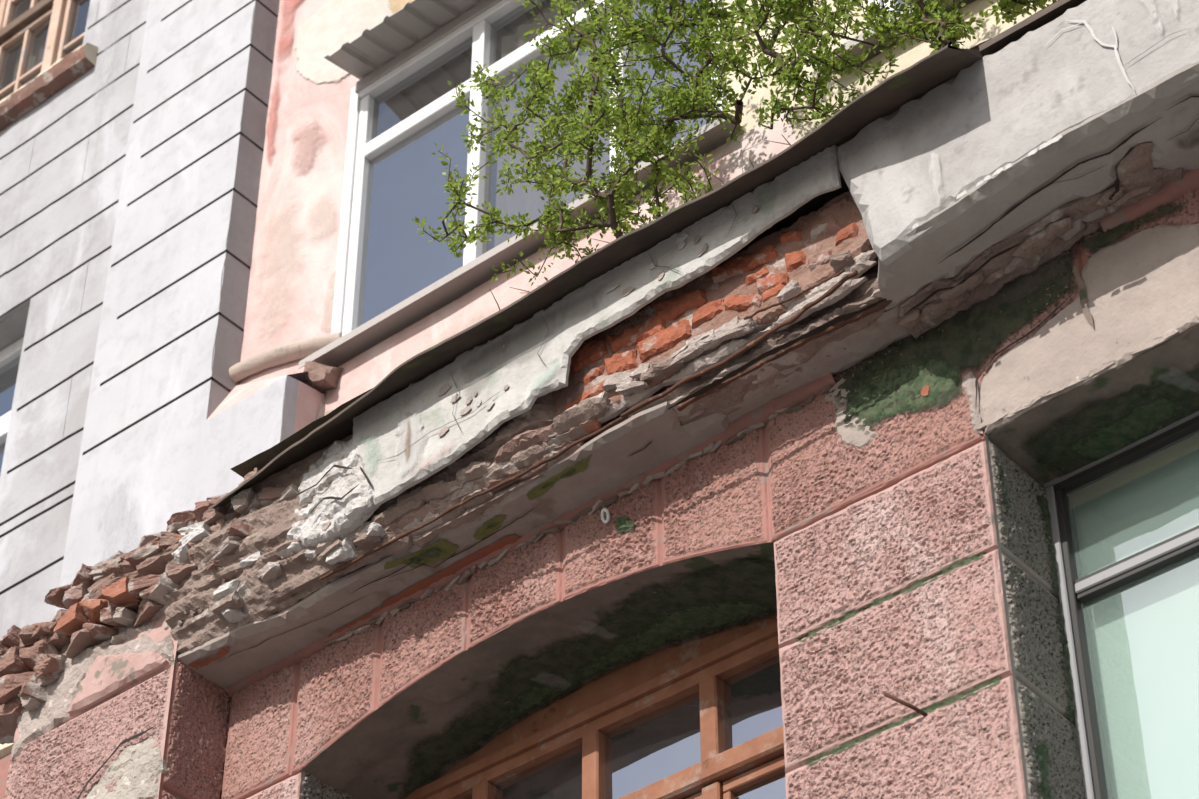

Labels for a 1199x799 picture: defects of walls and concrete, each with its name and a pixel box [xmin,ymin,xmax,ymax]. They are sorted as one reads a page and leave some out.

peeling [294,0,414,83]
crack [1047,20,1188,92]
spalling [1028,134,1063,157]
crack [938,96,1199,264]
flaking render [0,141,1199,762]